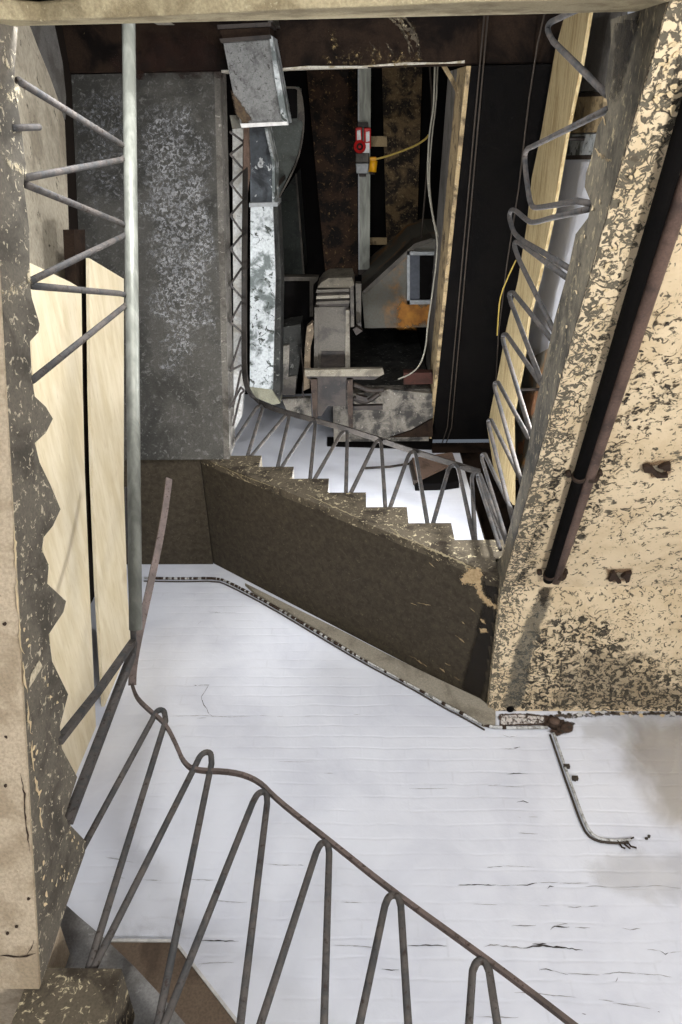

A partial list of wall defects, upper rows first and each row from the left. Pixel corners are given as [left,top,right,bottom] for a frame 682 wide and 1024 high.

rust [397,299,430,328]
peeling [460,567,497,609]
crack [459,866,681,1018]